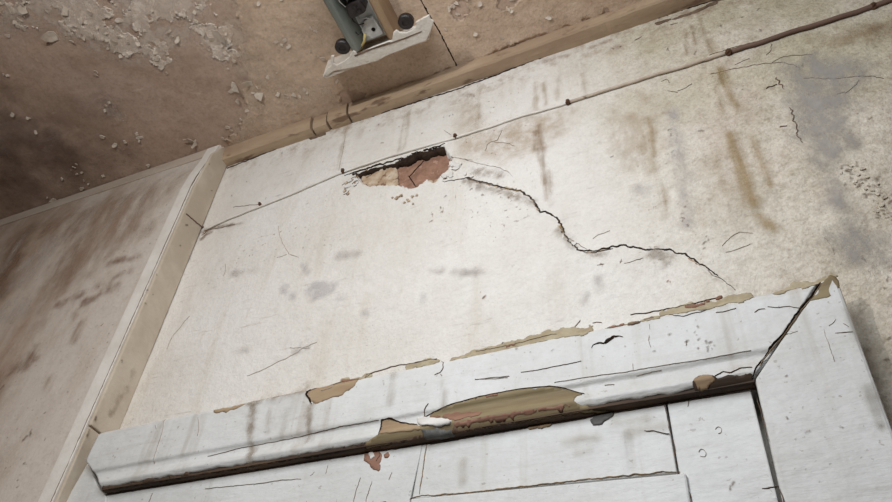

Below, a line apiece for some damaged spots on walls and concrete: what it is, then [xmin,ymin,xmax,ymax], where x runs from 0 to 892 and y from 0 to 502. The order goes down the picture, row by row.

spalling [655,1,718,25]
peeling [0,0,642,146]
spalling [342,143,462,205]
crack [443,131,821,385]
peeling [772,273,840,301]
peeling [296,293,754,404]
peeling [214,400,258,413]
peeling [364,385,614,471]